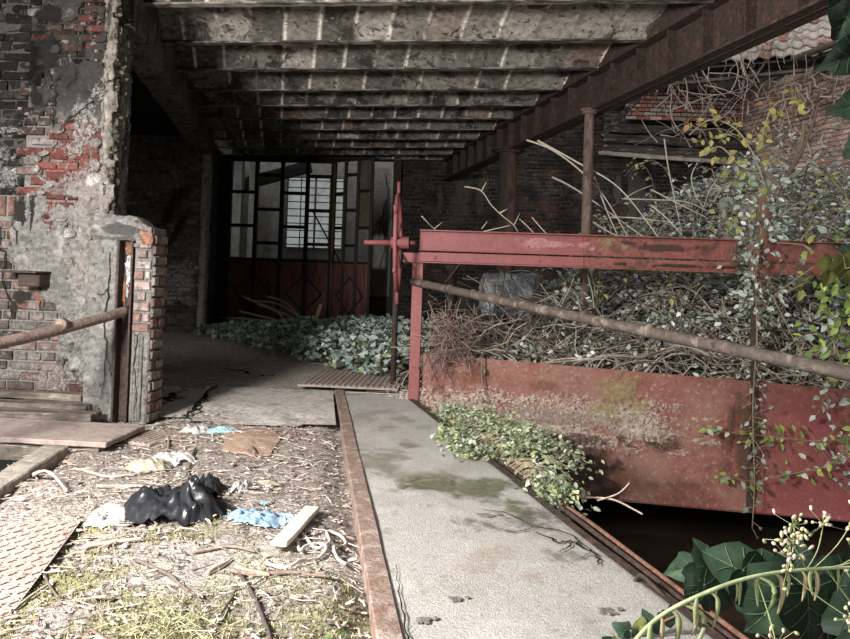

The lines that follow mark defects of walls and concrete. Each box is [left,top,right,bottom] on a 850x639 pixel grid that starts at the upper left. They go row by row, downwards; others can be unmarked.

peeling [22,0,115,297]
crack [162,368,279,419]
corrosion [526,428,682,499]
corrosion [719,392,762,483]
crack [481,508,601,565]
crack [396,566,413,639]